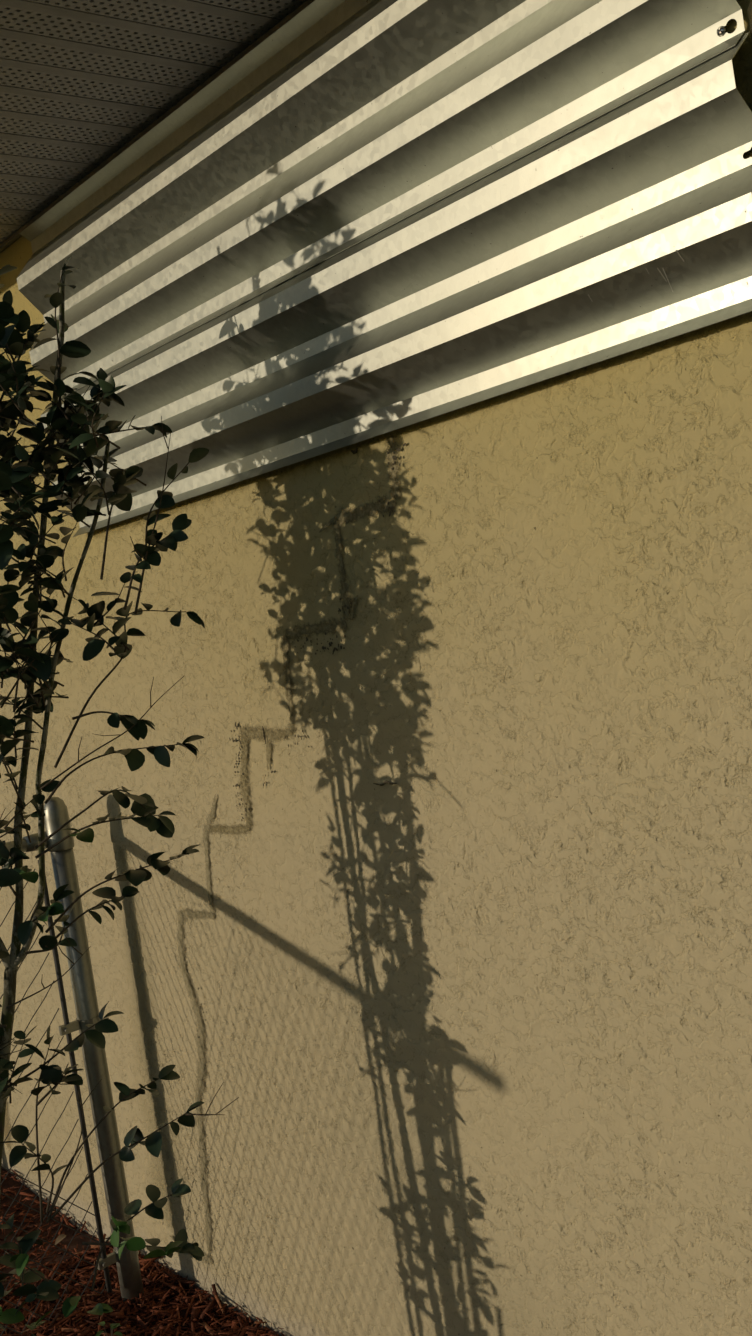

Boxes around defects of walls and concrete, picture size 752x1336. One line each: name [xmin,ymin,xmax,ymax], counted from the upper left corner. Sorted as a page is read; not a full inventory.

crack [169,435,406,1265]